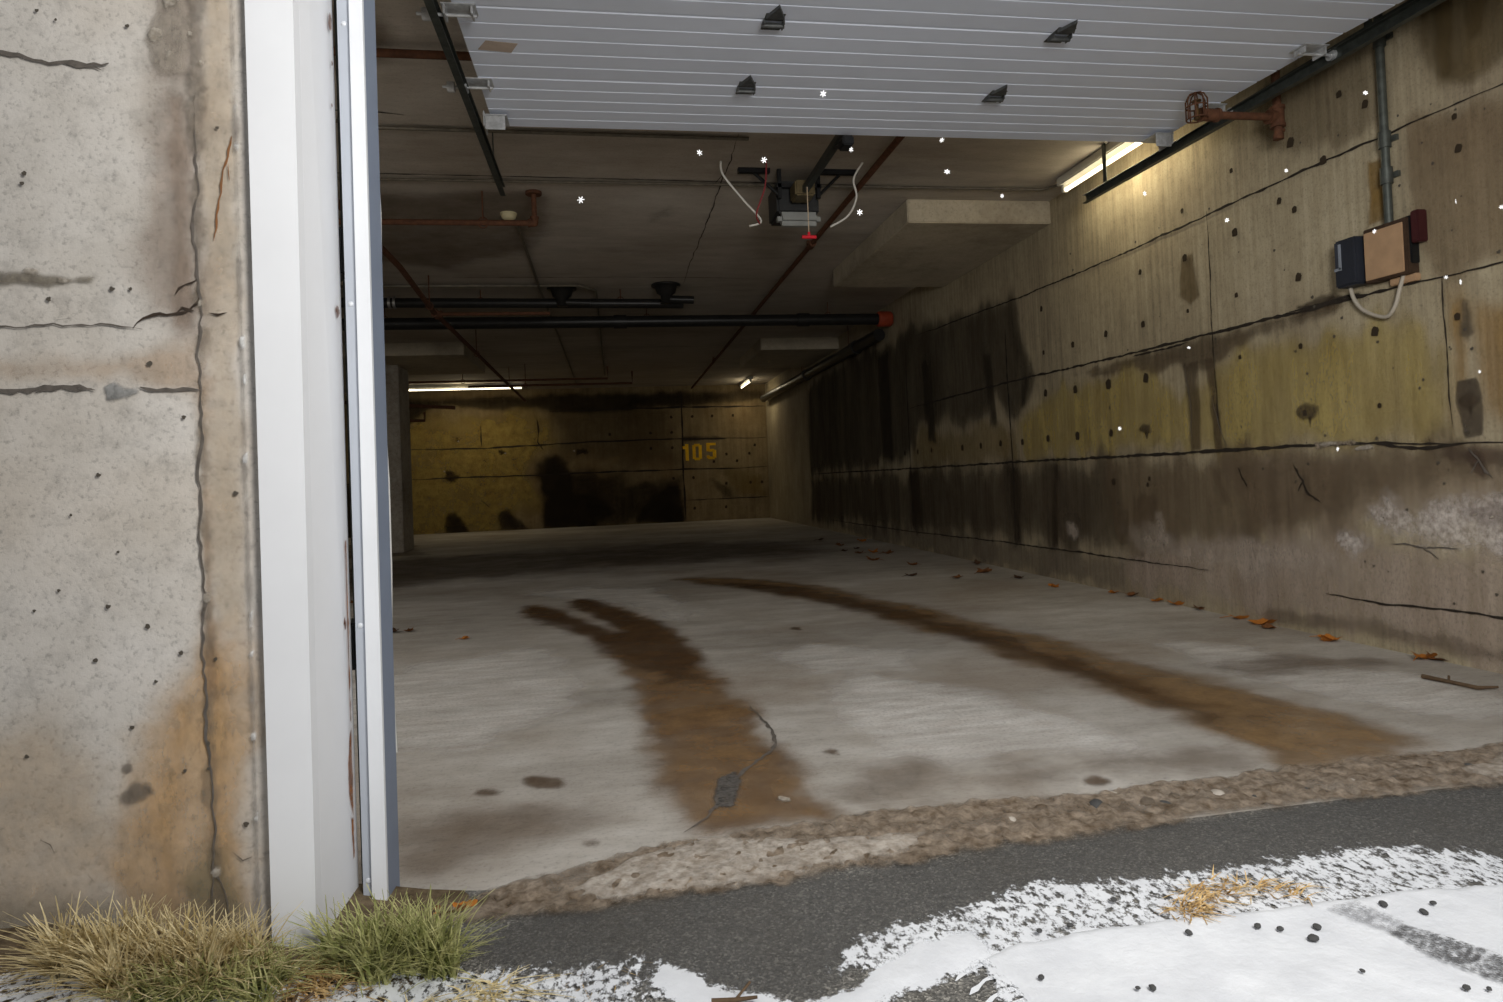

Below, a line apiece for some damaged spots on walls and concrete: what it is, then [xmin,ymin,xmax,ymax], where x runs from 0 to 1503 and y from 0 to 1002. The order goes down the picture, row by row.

crack [0,50,109,70]
crack [0,101,251,922]
leakage [409,392,761,534]
leakage [809,301,1383,609]
leakage [1373,378,1503,554]
corrosion [344,541,355,854]
leakage [1381,563,1503,661]